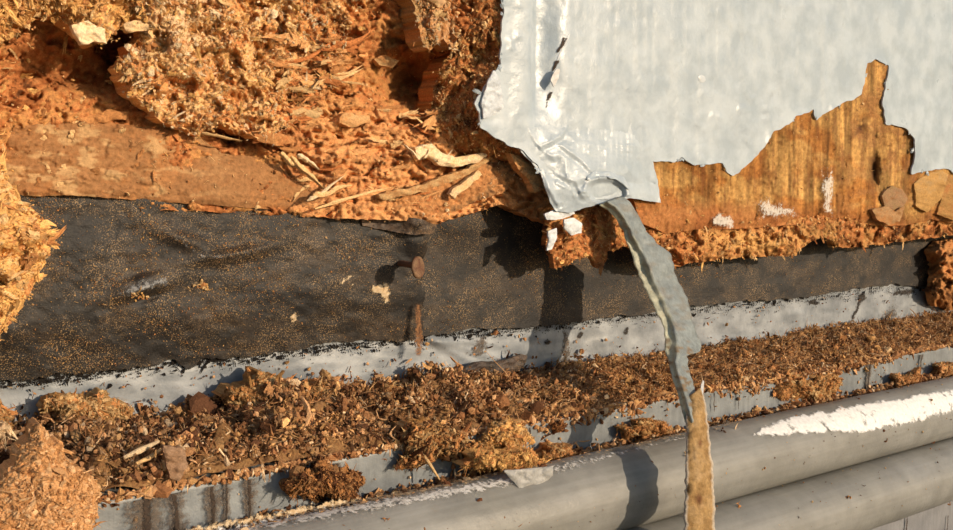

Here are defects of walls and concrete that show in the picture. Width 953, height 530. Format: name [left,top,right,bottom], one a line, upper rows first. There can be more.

spalling [0,0,575,334]
rust [415,305,423,355]
peeling [541,60,953,530]